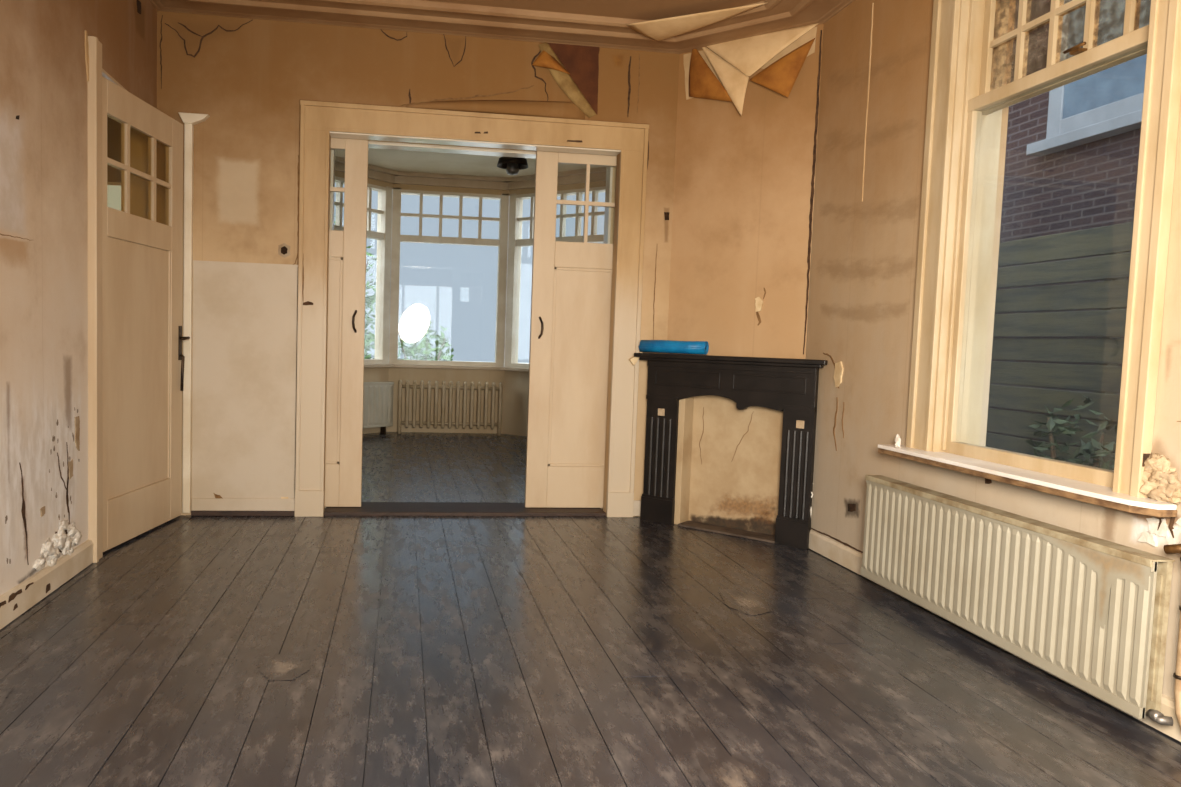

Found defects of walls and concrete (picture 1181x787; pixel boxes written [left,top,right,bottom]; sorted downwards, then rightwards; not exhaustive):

flaking render [761,27,817,69]
flaking render [684,49,736,100]